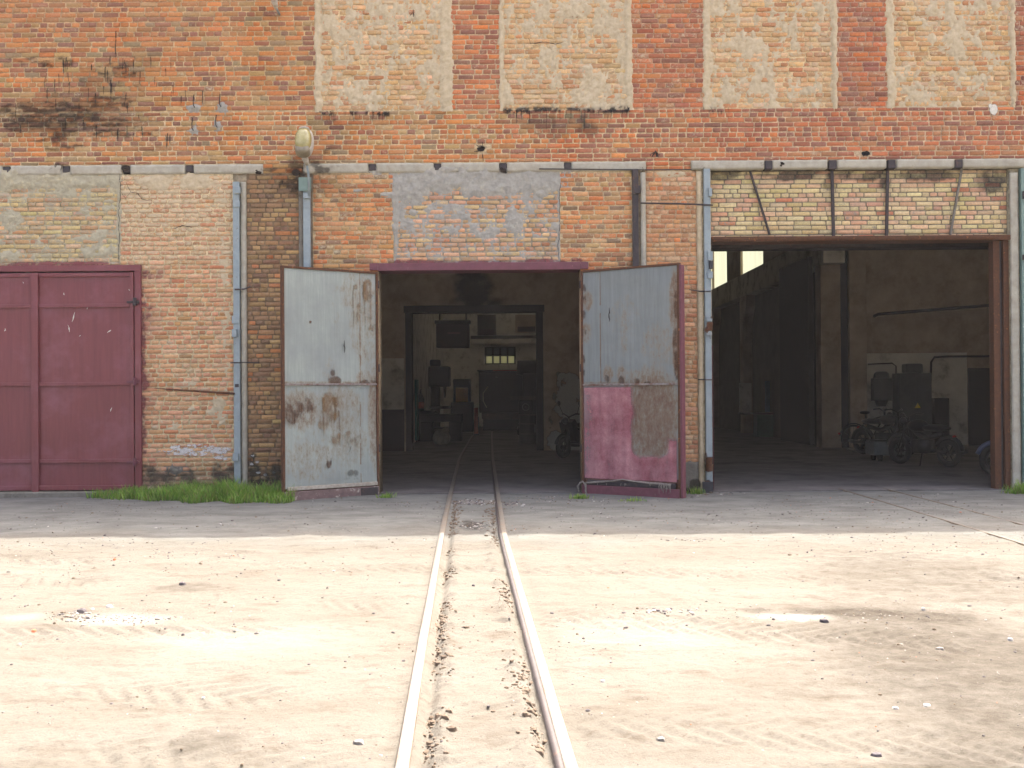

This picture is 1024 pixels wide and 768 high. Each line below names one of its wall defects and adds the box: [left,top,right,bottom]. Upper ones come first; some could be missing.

leakage [88,31,141,102]
corrosion [286,371,349,442]